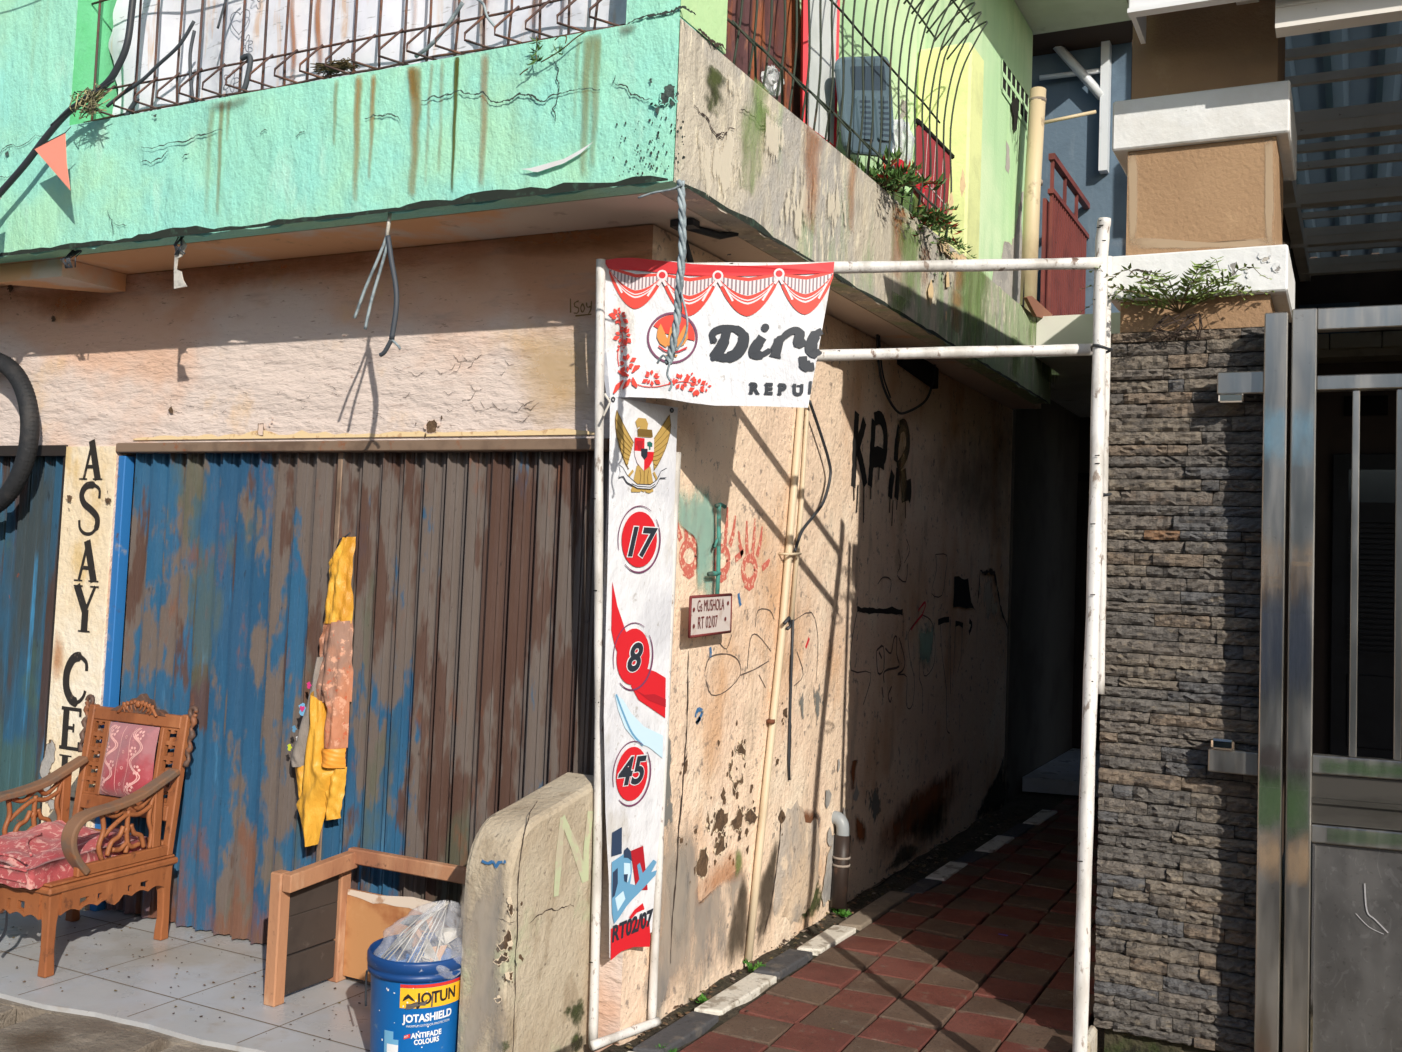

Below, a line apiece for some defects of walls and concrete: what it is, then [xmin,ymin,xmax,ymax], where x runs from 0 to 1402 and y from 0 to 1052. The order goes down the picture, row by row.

rust [355,77,375,143]
rust [409,67,420,148]
rust [451,57,459,189]
crack [365,61,652,121]
leakage [745,82,769,146]
leakage [833,225,956,346]
leakage [973,330,1048,403]
spalling [664,721,759,883]
spalling [493,893,524,1011]